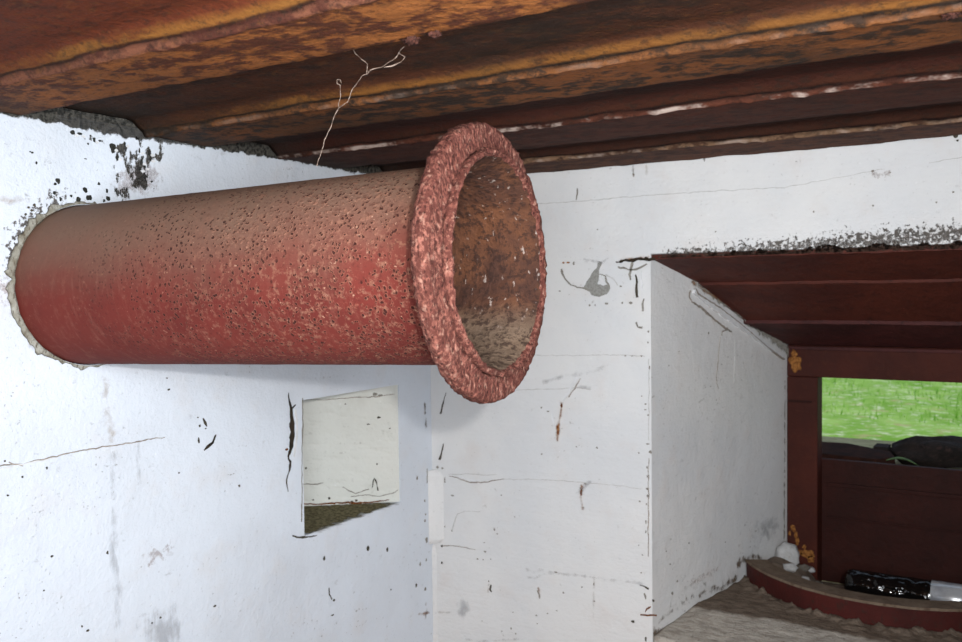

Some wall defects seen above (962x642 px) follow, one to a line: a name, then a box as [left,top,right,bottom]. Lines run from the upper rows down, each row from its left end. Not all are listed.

spalling [559,261,622,306]
rust [788,350,802,373]
rust [541,376,581,441]
crack [0,437,165,469]
crack [285,392,394,492]
rust [788,525,815,563]